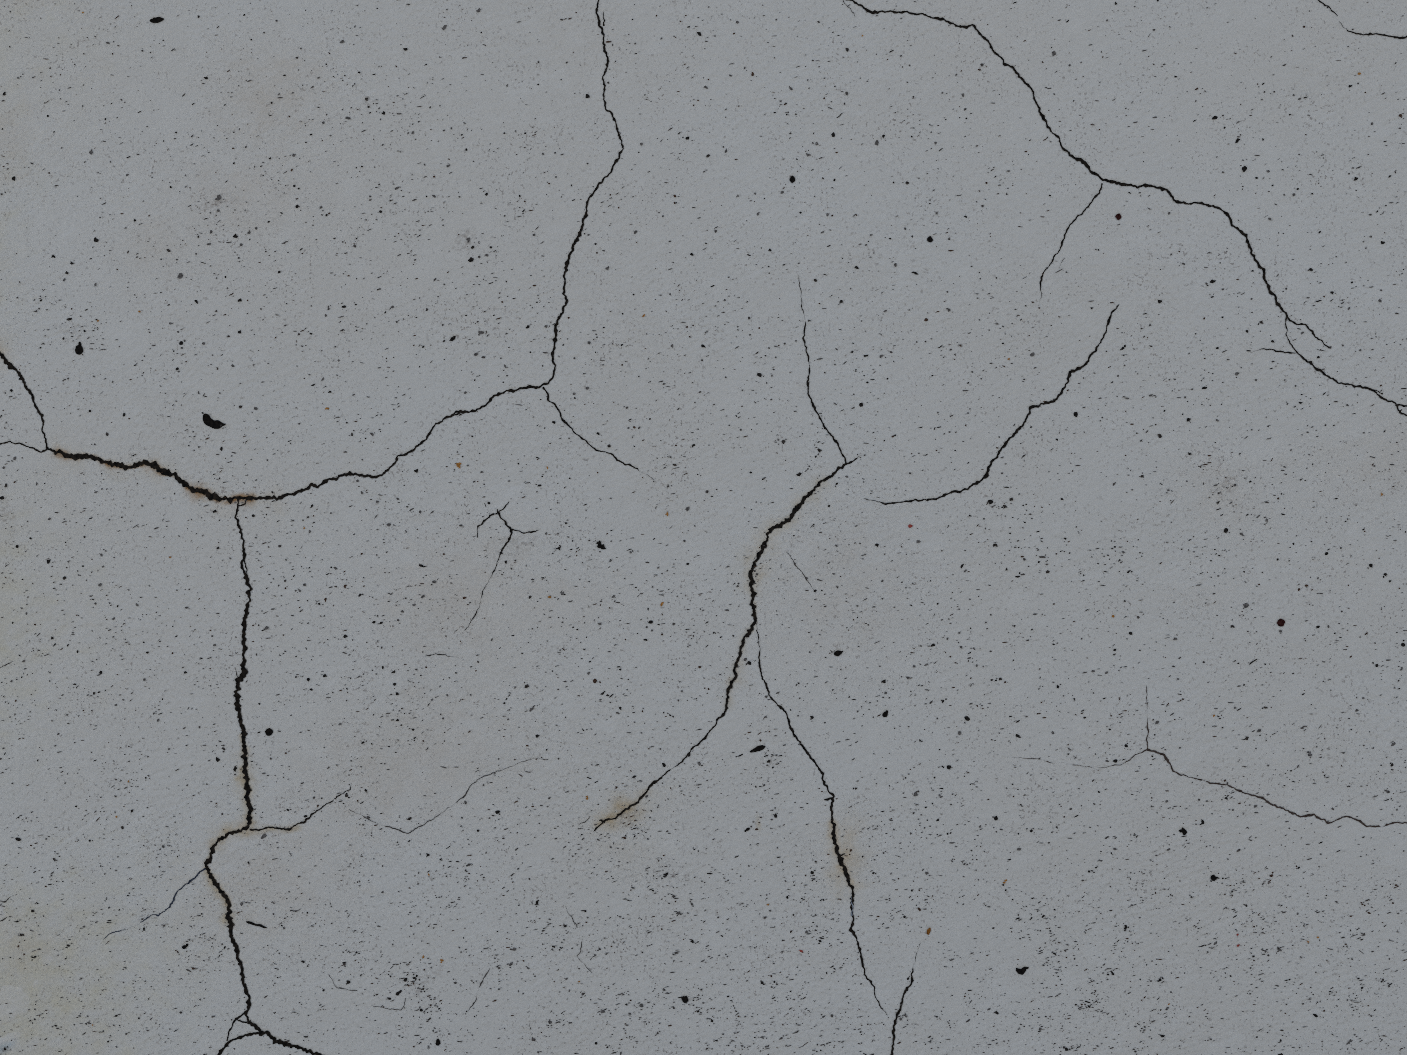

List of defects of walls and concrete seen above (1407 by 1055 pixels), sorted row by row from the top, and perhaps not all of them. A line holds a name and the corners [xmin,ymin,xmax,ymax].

crack [0,0,654,1055]
crack [580,276,920,1055]
crack [865,304,1119,505]
crack [843,0,1407,416]
crack [1019,686,1407,827]